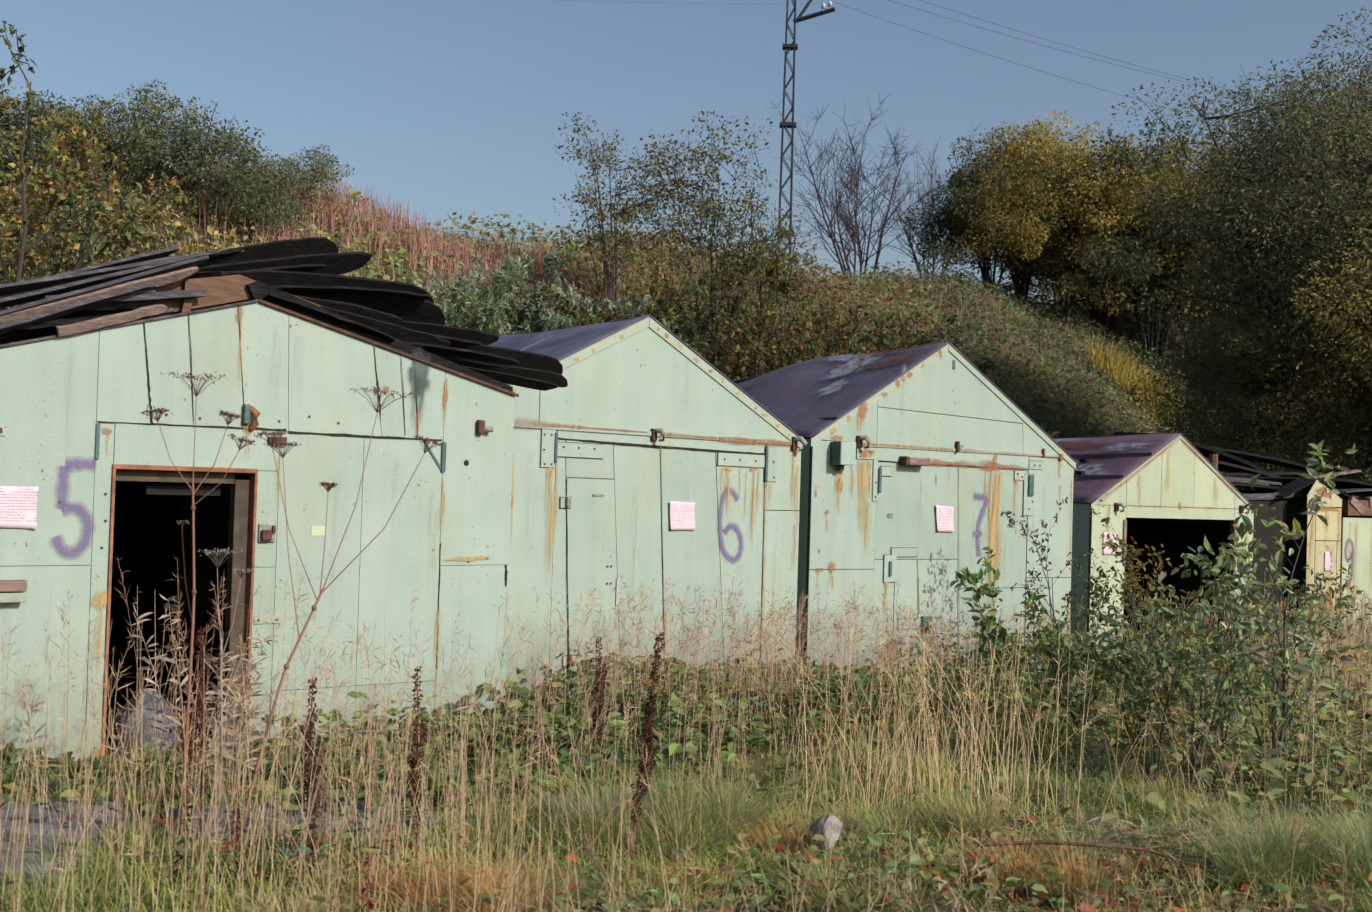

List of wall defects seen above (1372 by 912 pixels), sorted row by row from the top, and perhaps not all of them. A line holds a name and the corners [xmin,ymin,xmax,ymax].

leakage [410,353,429,405]
corrosion [547,463,558,553]
corrosion [825,403,1017,581]